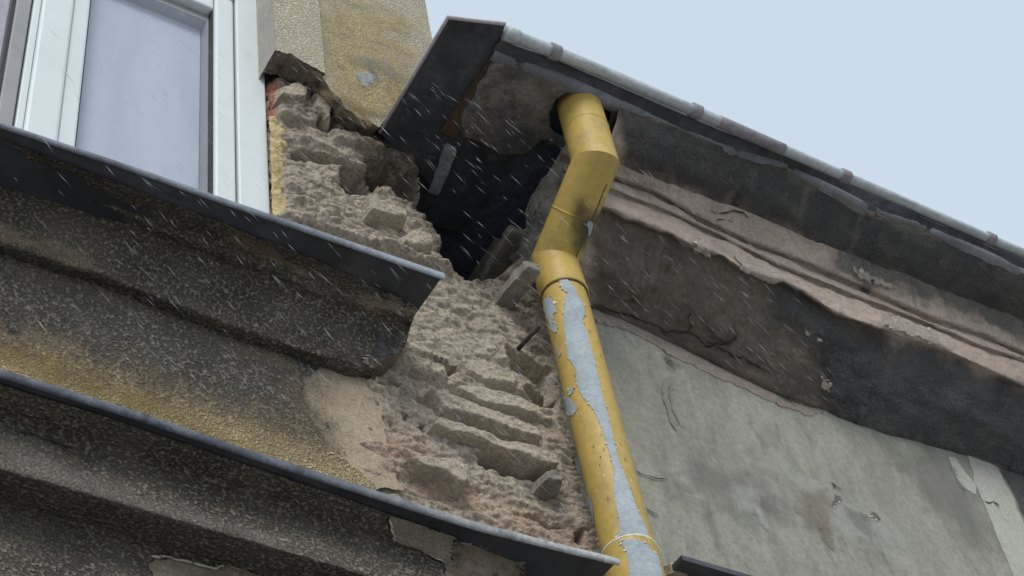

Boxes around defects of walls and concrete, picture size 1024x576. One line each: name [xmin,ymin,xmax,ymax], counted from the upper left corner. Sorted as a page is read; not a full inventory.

spalling [262,50,823,576]
crack [590,302,779,373]
flaking render [837,250,1024,339]